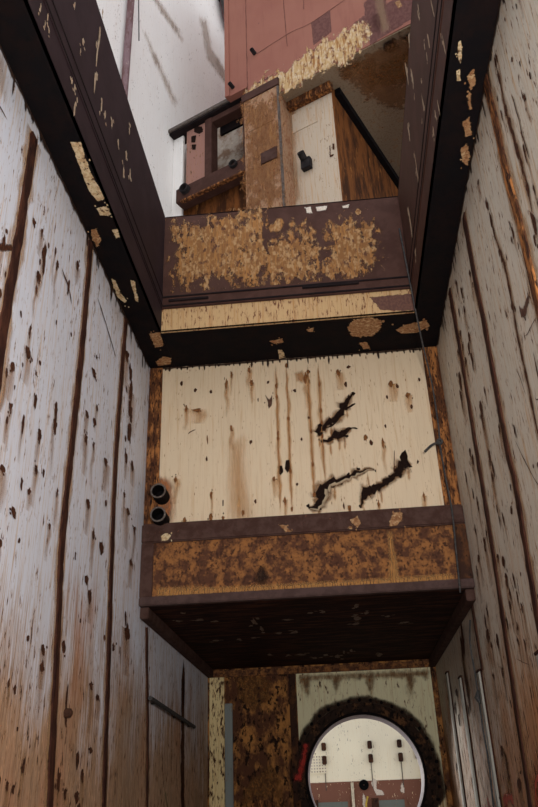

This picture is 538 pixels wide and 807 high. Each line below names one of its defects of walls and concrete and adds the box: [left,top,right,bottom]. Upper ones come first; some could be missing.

peeling [94,9,114,127]
rust [339,0,412,109]
peeling [70,142,112,218]
peeling [163,21,384,292]
rust [0,128,72,429]
peeling [347,317,430,351]
rust [40,238,99,807]
rust [89,317,136,771]
rust [158,536,451,596]